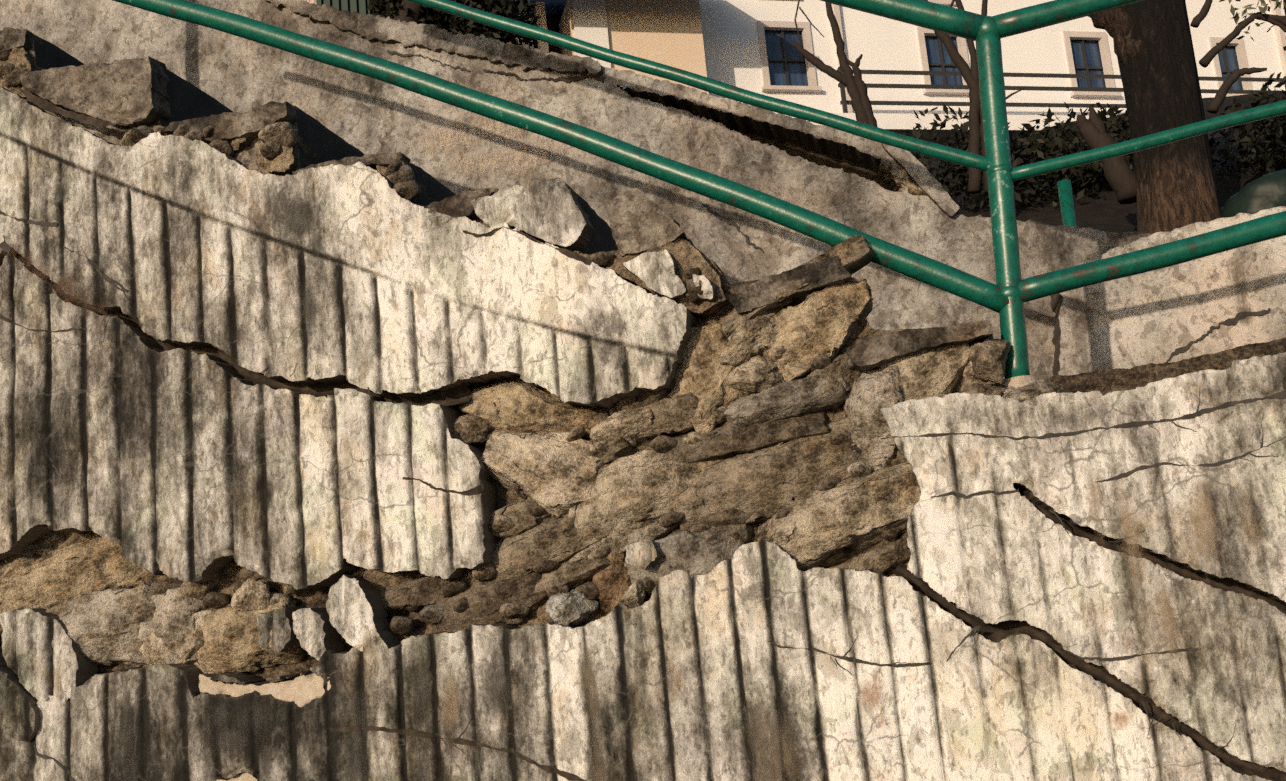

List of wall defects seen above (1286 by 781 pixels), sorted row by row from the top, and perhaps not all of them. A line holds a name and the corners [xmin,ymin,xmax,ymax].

spalling [0,45,46,98]
crack [387,50,604,84]
spalling [115,122,317,176]
crack [730,129,927,196]
crack [0,211,471,414]
spalling [0,234,1008,742]
crack [931,485,1286,615]
crack [768,562,1286,781]